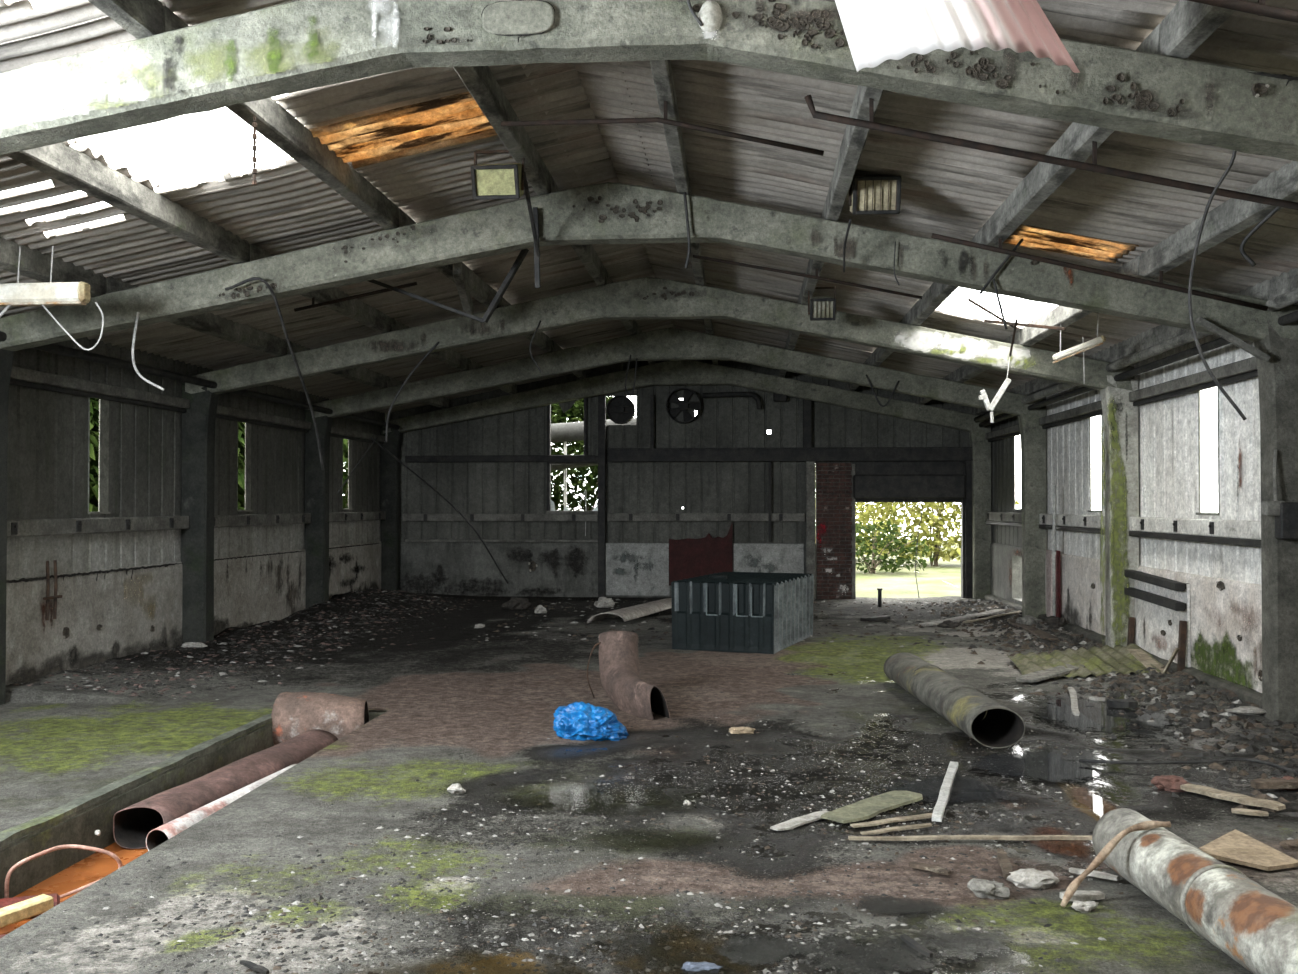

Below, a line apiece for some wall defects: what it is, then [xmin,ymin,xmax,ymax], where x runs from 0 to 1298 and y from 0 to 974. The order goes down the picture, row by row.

spalling [731,0,845,49]
spalling [896,50,1011,89]
spalling [1102,72,1184,117]
water stain [400,546,587,597]